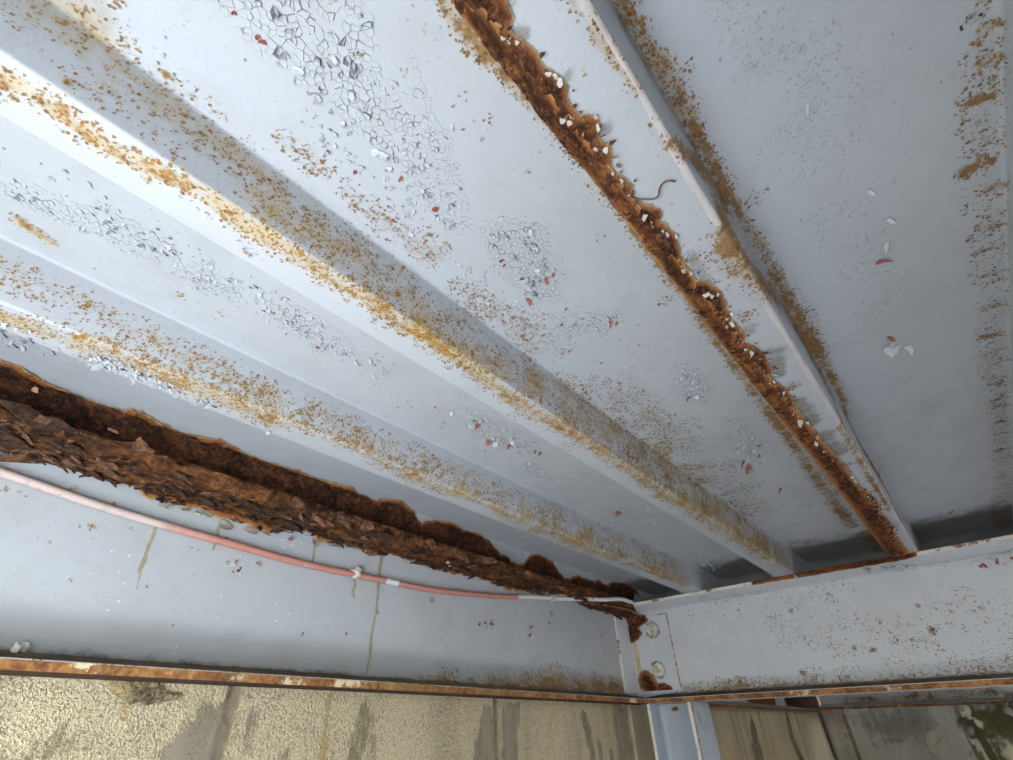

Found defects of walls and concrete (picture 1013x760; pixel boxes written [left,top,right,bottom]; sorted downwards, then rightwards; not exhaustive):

rust [953,0,1013,526]
rust [0,0,917,591]
rust [0,359,1013,699]
water stain [163,704,229,760]
water stain [474,703,520,760]
water stain [582,704,633,760]
rust [784,696,833,713]
rust [842,687,1001,704]
water stain [960,705,983,728]
water stain [968,736,1013,760]